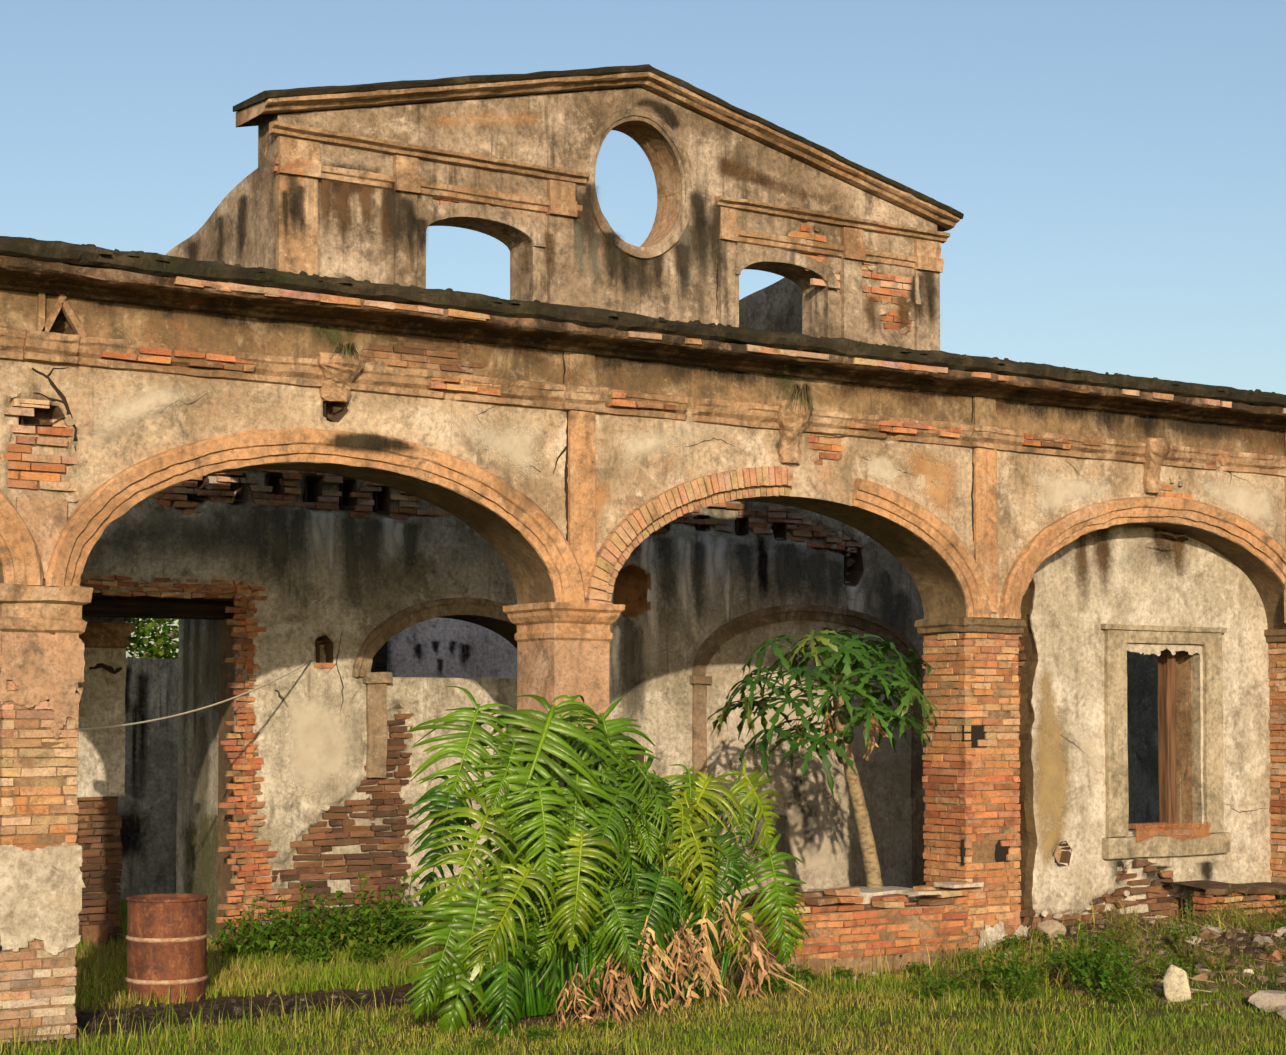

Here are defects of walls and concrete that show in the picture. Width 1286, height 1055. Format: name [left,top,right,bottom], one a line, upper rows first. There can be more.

leakage [217,194,246,262]
leakage [282,164,427,249]
spalling [862,261,917,334]
crack [32,367,78,452]
spalling [151,470,450,520]
spalling [652,502,863,557]
leakage [1076,528,1110,580]
leakage [609,533,864,717]
leakage [125,666,147,785]
spalling [80,574,414,951]
leakage [1037,676,1067,861]
spalling [994,578,1210,936]